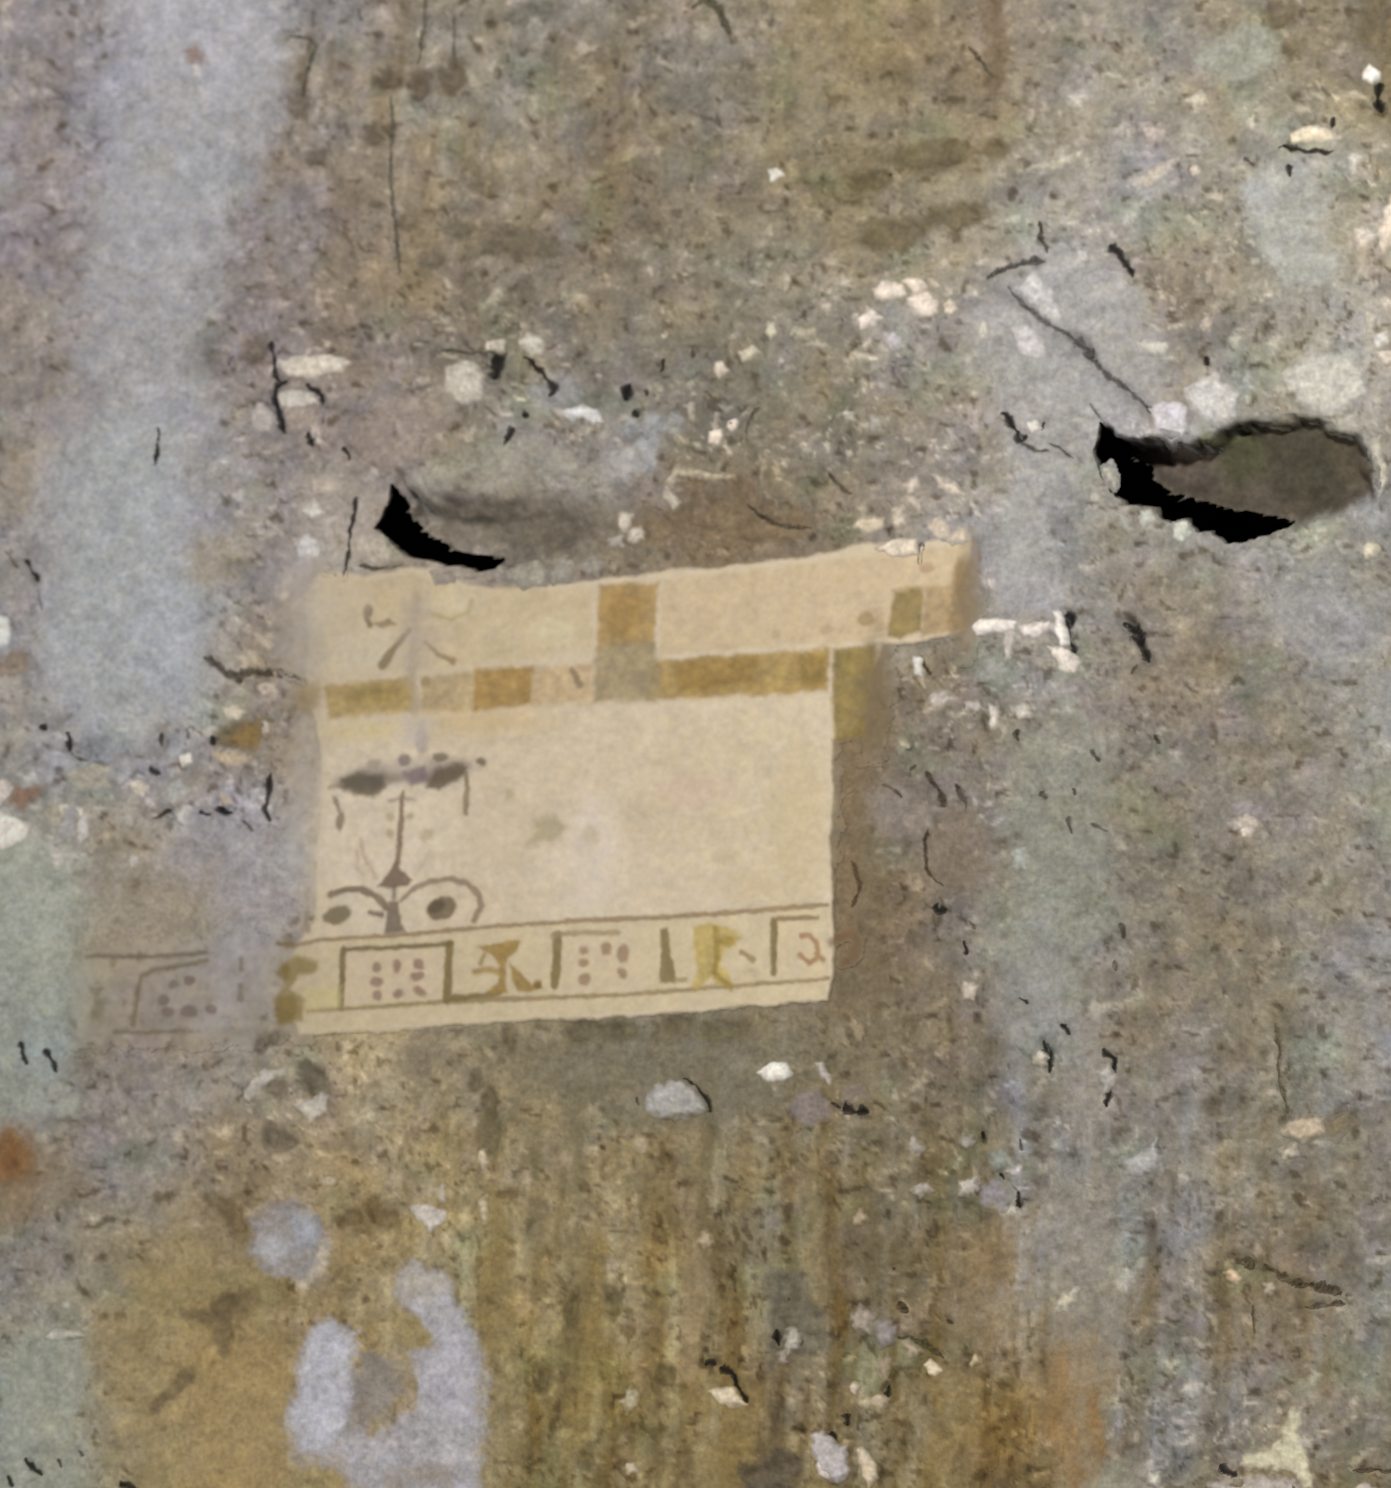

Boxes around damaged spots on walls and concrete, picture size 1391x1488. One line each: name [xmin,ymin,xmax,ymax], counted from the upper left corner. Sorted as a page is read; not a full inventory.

spalling [1376,194,1391,260]
spalling [1009,267,1064,360]
spalling [1026,418,1045,434]
spalling [1093,309,1391,544]
spalling [296,469,349,560]
spalling [354,479,646,591]